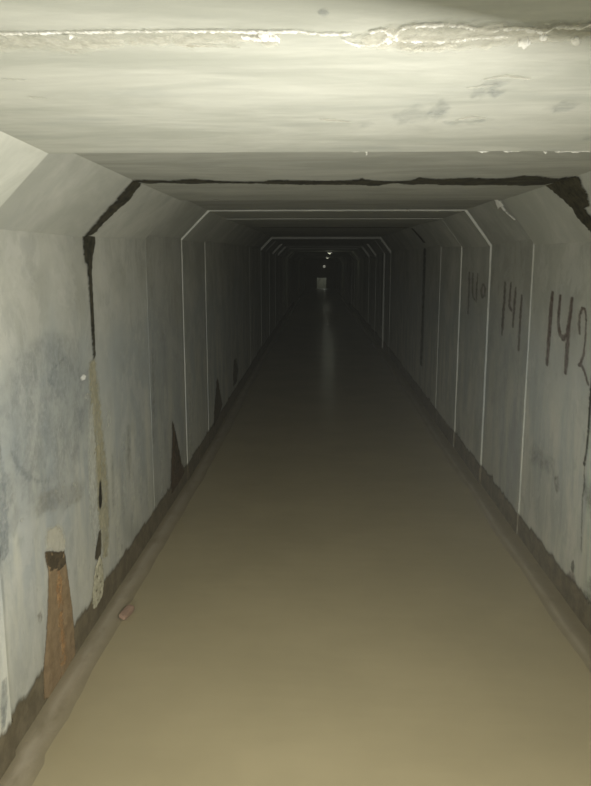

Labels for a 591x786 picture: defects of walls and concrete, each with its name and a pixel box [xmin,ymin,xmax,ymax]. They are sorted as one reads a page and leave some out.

crack [83,176,591,366]
water stain [68,302,294,661]
water stain [349,302,591,634]
crack [582,386,591,503]
corrosion [43,527,75,699]
flaking render [92,556,104,609]
water stain [0,669,48,780]